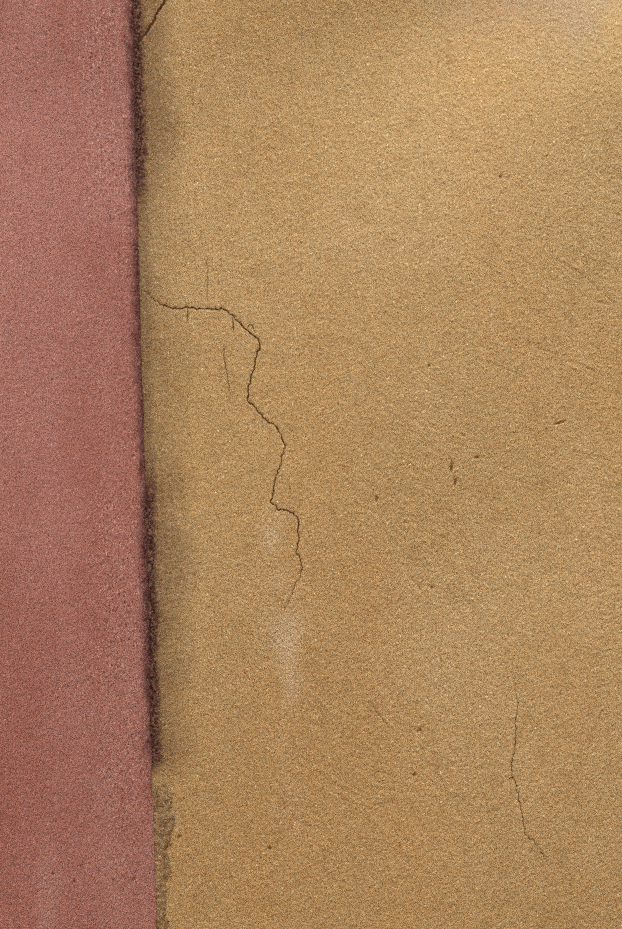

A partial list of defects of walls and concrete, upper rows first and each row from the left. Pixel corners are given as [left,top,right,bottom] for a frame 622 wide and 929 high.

crack [139,0,167,43]
crack [145,291,303,616]